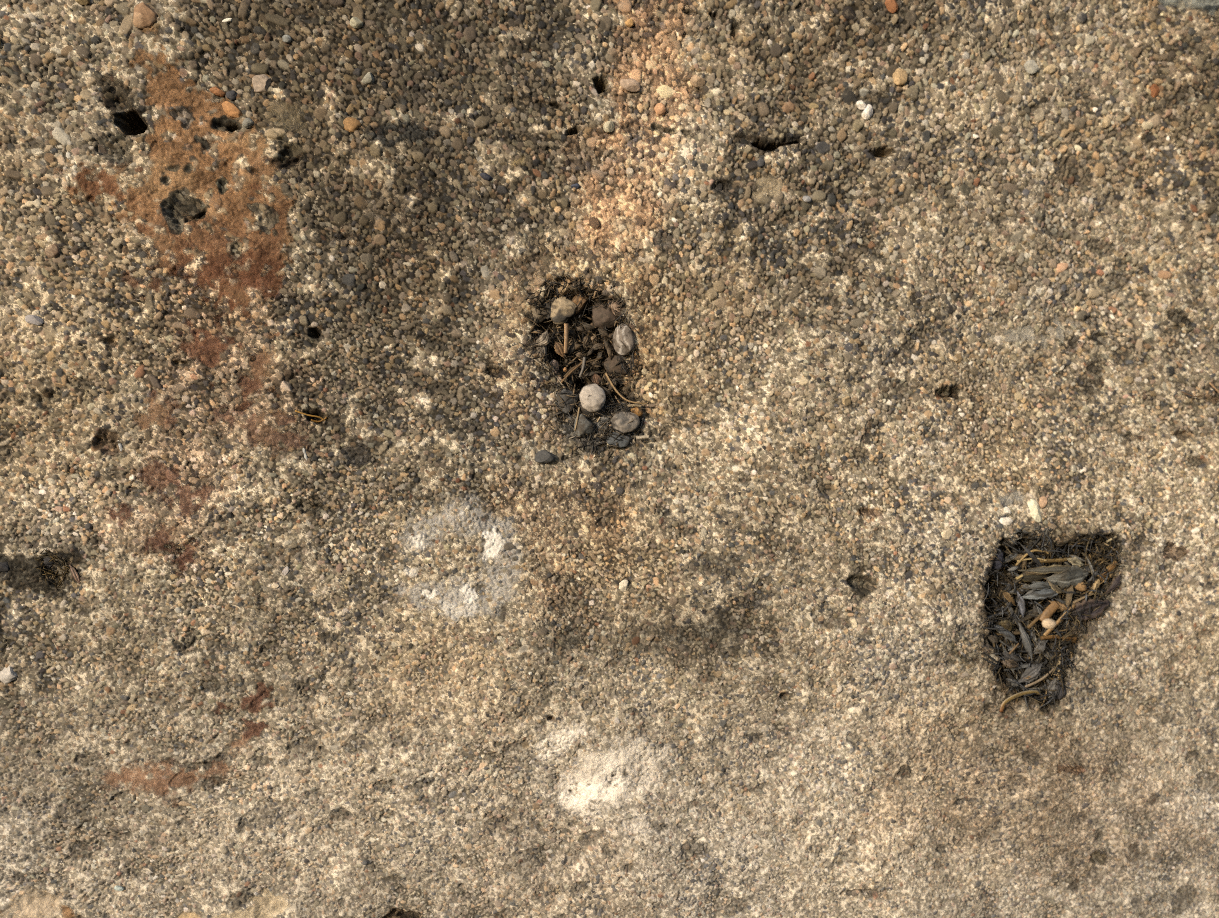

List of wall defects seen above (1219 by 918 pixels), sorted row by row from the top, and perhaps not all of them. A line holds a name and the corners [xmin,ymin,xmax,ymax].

rust [67,46,293,317]
spalling [525,276,636,406]
rust [181,321,307,450]
rust [134,390,178,428]
water stain [410,535,425,550]
water stain [481,525,505,562]
spalling [36,550,76,593]
water stain [421,584,477,621]
spalling [981,499,1187,713]